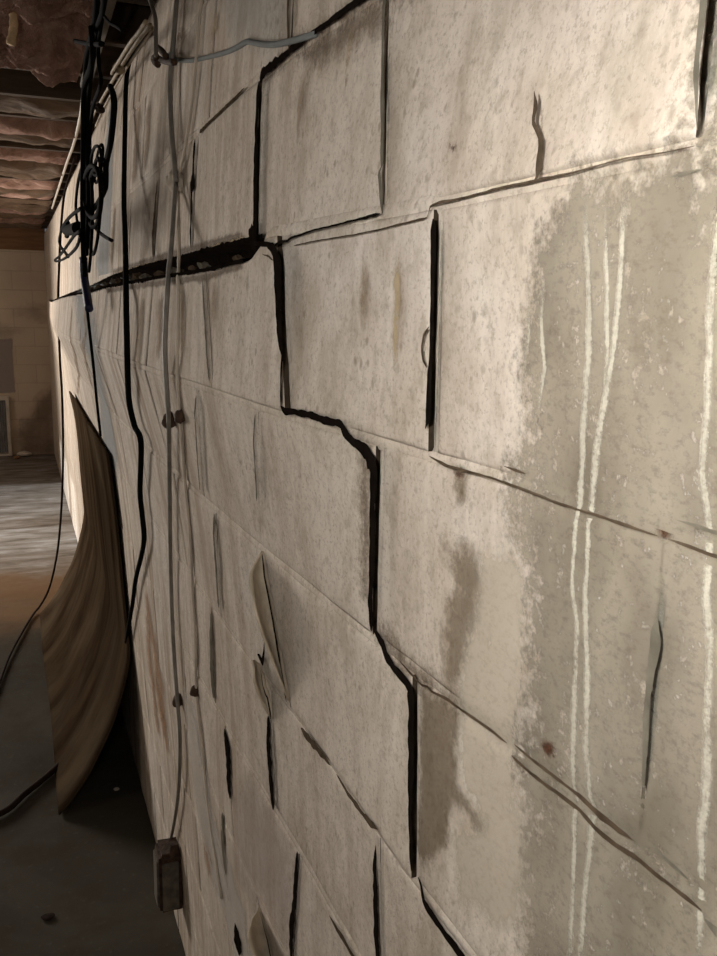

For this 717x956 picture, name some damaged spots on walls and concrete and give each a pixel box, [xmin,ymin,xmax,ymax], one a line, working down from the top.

crack [51,289,83,302]
crack [90,0,717,871]
leakage [456,471,464,500]
leakage [502,71,717,956]
leakage [446,545,481,681]
crack [289,852,298,956]
crack [301,728,380,956]
crack [418,877,465,956]
leakage [417,691,481,860]
crack [511,744,702,911]
crack [704,918,717,937]